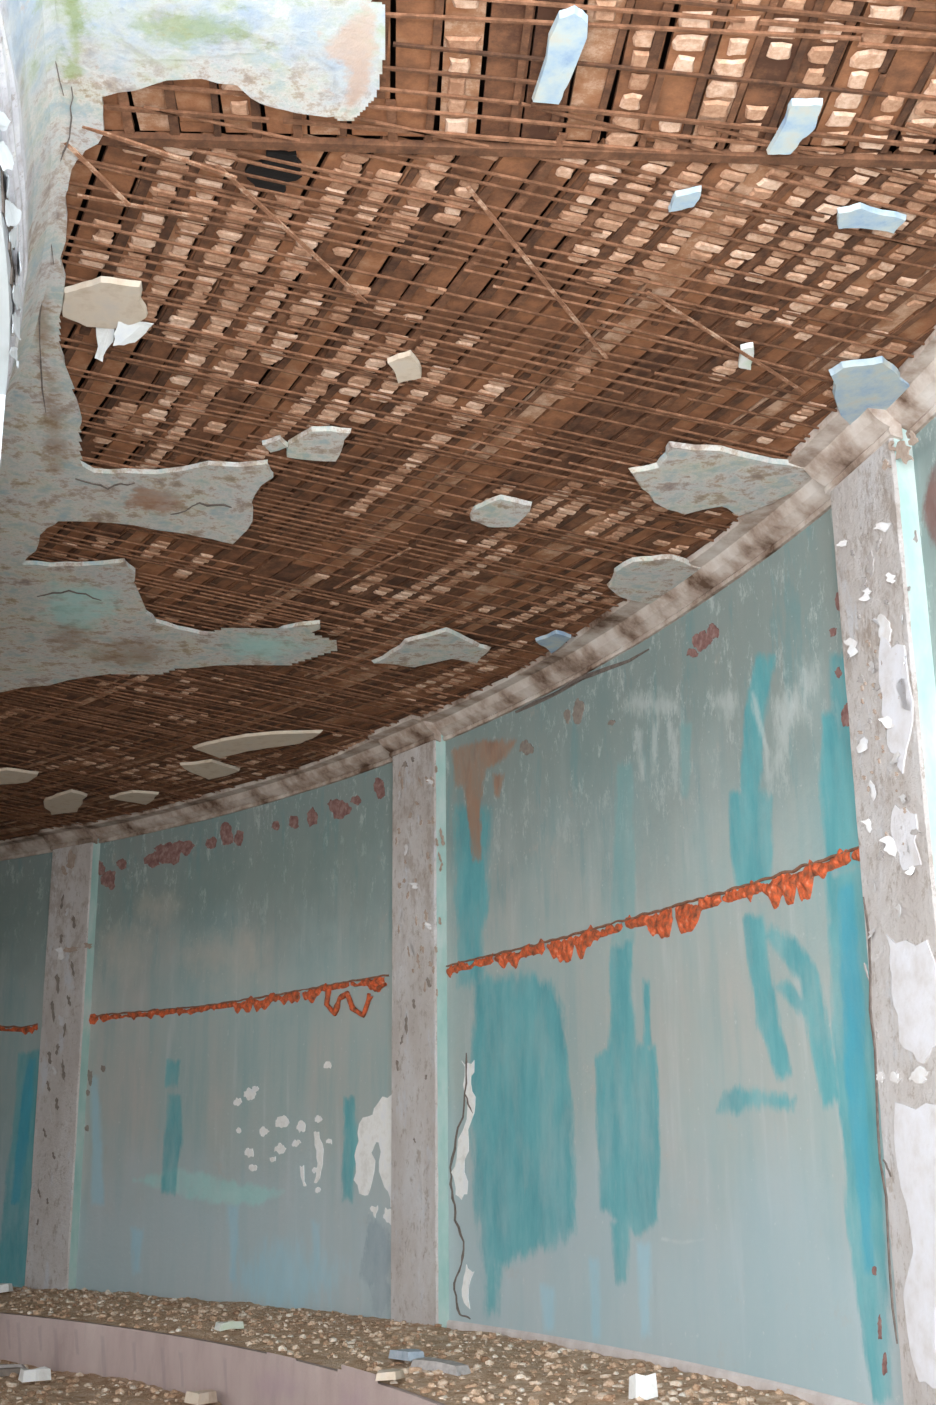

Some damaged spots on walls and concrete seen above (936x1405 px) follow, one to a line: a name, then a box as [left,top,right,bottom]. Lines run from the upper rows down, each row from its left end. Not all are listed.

peeling [50,0,385,316]
peeling [0,111,288,692]
peeling [882,430,936,560]
peeling [109,790,159,805]
peeling [180,759,240,779]
corrosion [448,731,520,866]
flaking render [271,522,922,1071]
peeling [867,929,936,1084]
peeling [236,1115,332,1193]
flaking render [354,1095,392,1225]
crack [449,1053,473,1319]
peeling [894,1102,936,1389]